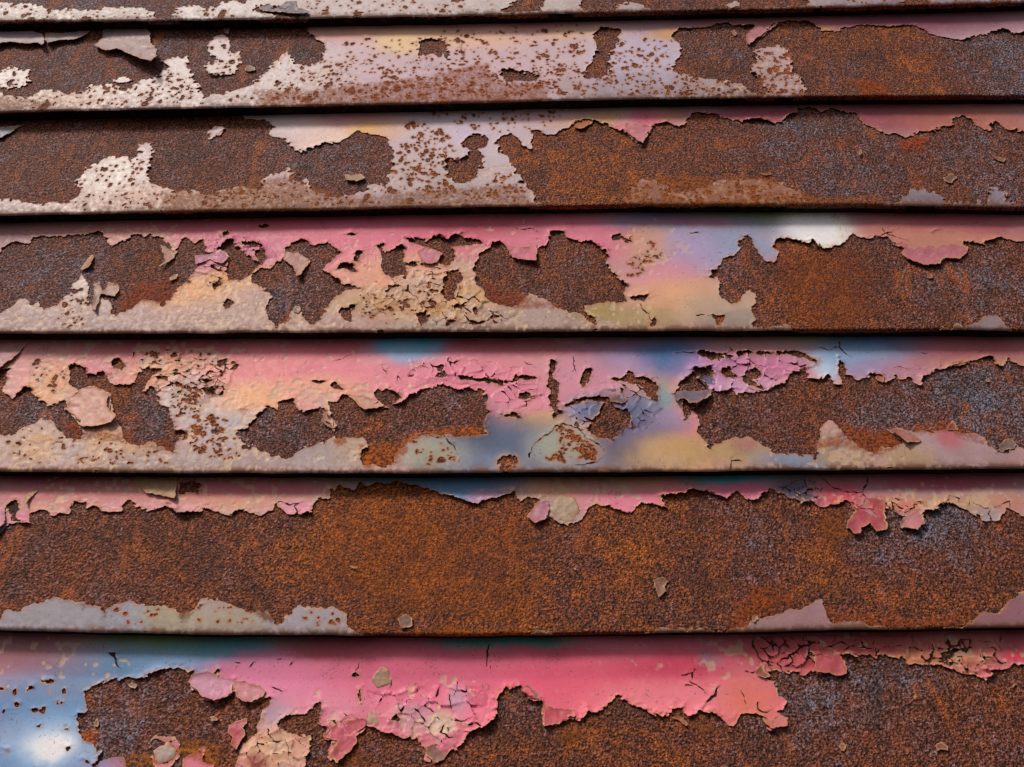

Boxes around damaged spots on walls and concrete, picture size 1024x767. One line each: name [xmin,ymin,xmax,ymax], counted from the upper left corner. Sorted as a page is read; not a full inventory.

peeling [0,0,326,99]
peeling [445,0,1024,211]
peeling [0,116,395,206]
corrosion [624,178,878,206]
crack [377,268,506,327]
peeling [710,233,1024,333]
crack [382,358,541,405]
crack [528,377,658,465]
corrosion [819,426,896,453]
peeling [0,477,1024,637]
peeling [277,647,1024,767]
crack [682,635,1006,715]